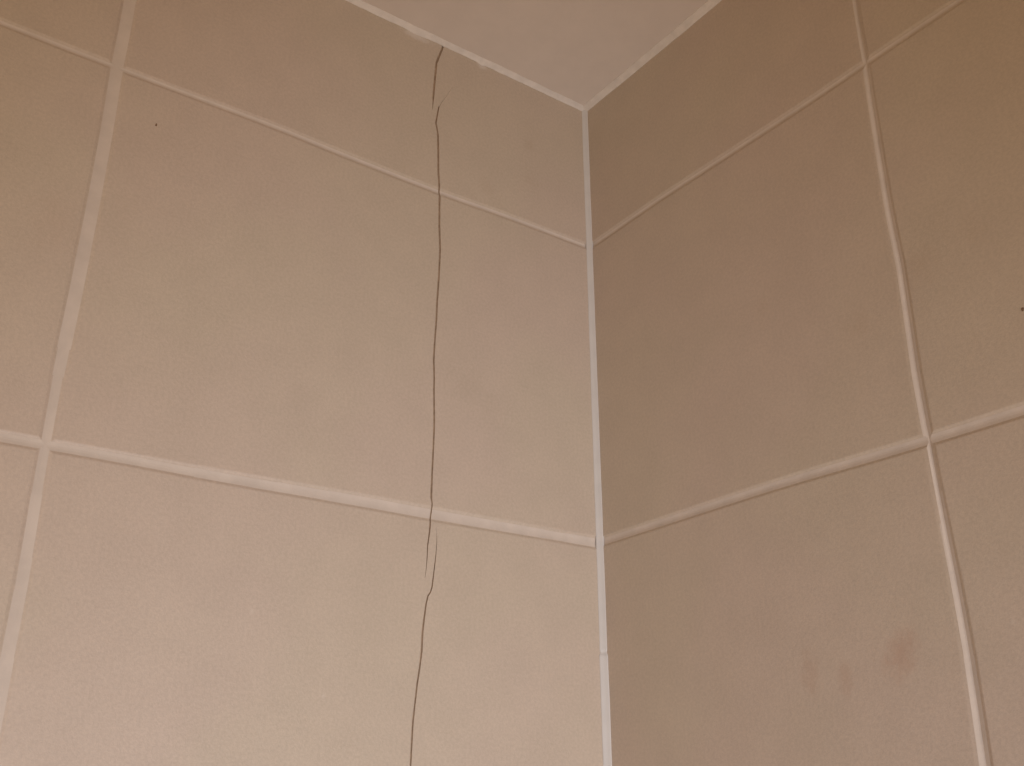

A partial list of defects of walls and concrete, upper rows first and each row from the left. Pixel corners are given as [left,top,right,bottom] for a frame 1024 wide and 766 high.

crack [410,46,448,766]